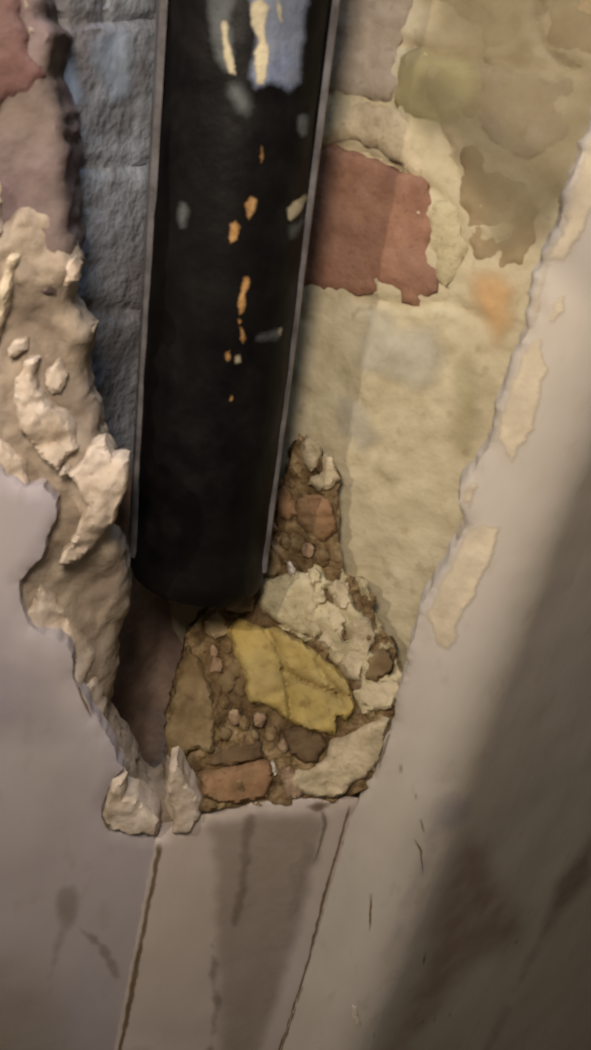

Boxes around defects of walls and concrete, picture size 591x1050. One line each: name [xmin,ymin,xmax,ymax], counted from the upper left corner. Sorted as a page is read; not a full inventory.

peeling [549,147,591,258]
peeling [499,340,547,458]
flaking render [0,198,202,835]
peeling [427,525,498,647]
water stain [211,816,318,1050]